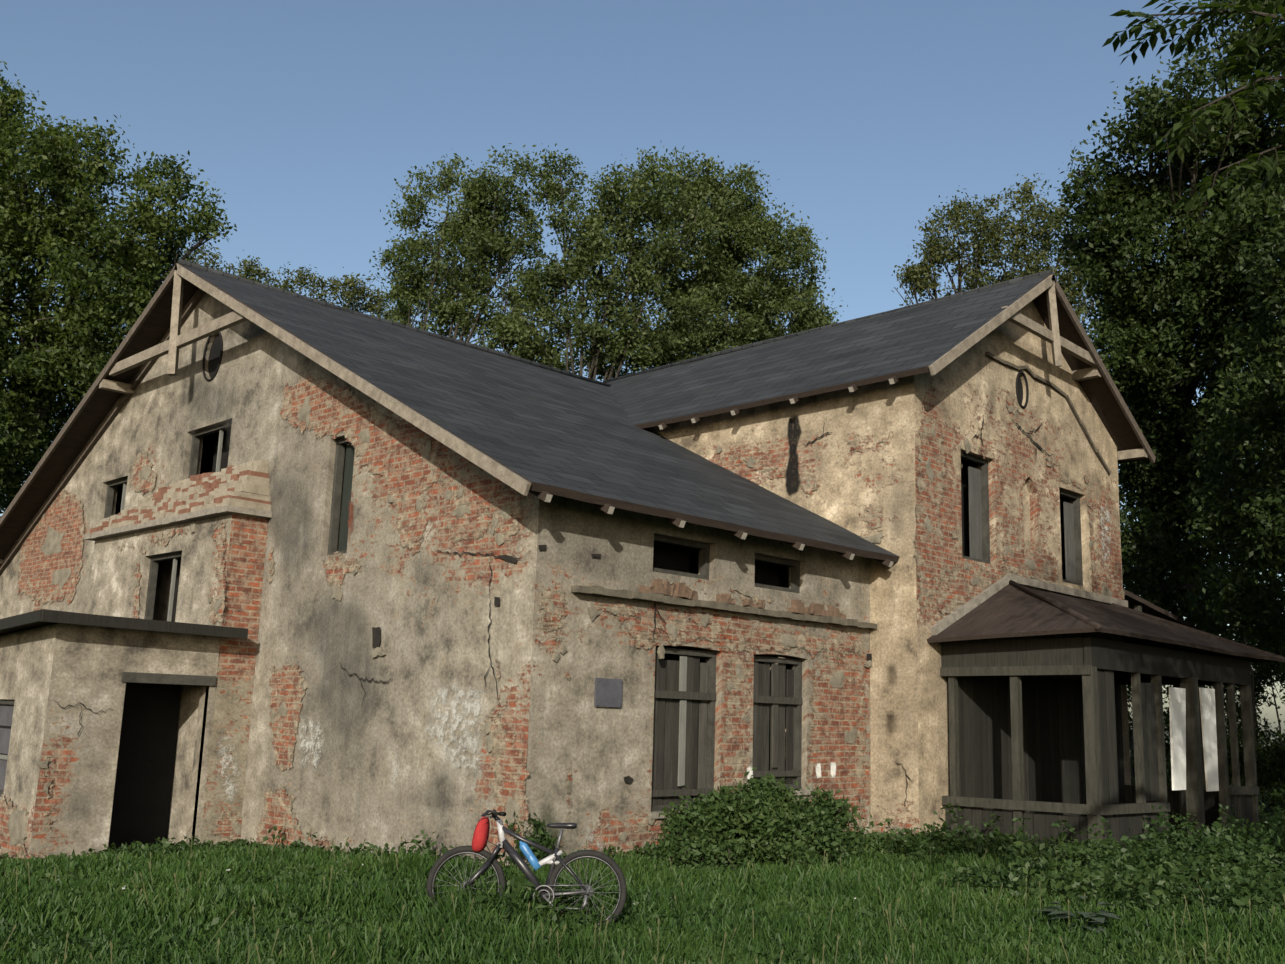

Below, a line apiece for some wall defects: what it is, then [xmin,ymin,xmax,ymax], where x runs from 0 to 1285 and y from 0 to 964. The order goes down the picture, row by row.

spalling [17,489,85,605]
spalling [208,520,228,624]
spalling [279,374,524,563]
crack [432,550,530,701]
spalling [914,416,1059,617]
spalling [1045,453,1125,599]
spalling [0,756,57,860]
crack [55,701,113,744]
spalling [212,663,342,852]
spalling [587,601,872,831]